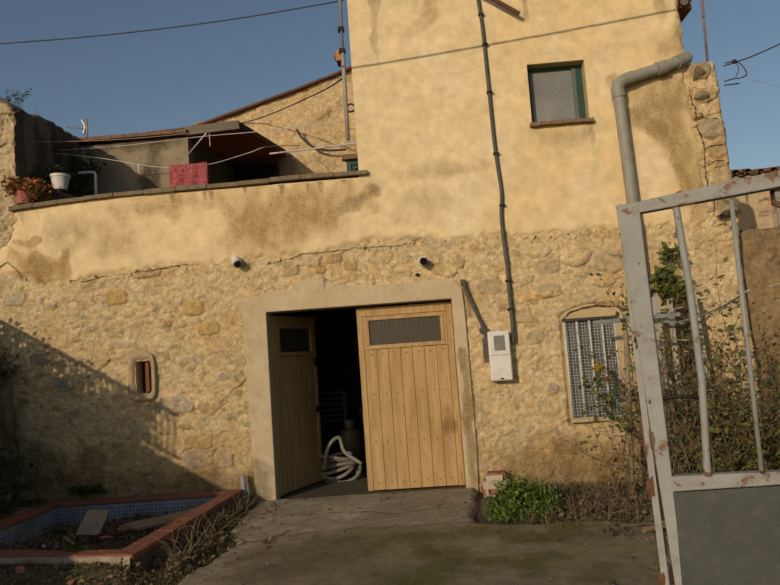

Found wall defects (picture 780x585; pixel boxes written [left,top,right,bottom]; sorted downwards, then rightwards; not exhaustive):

leakage [24,251,67,284]